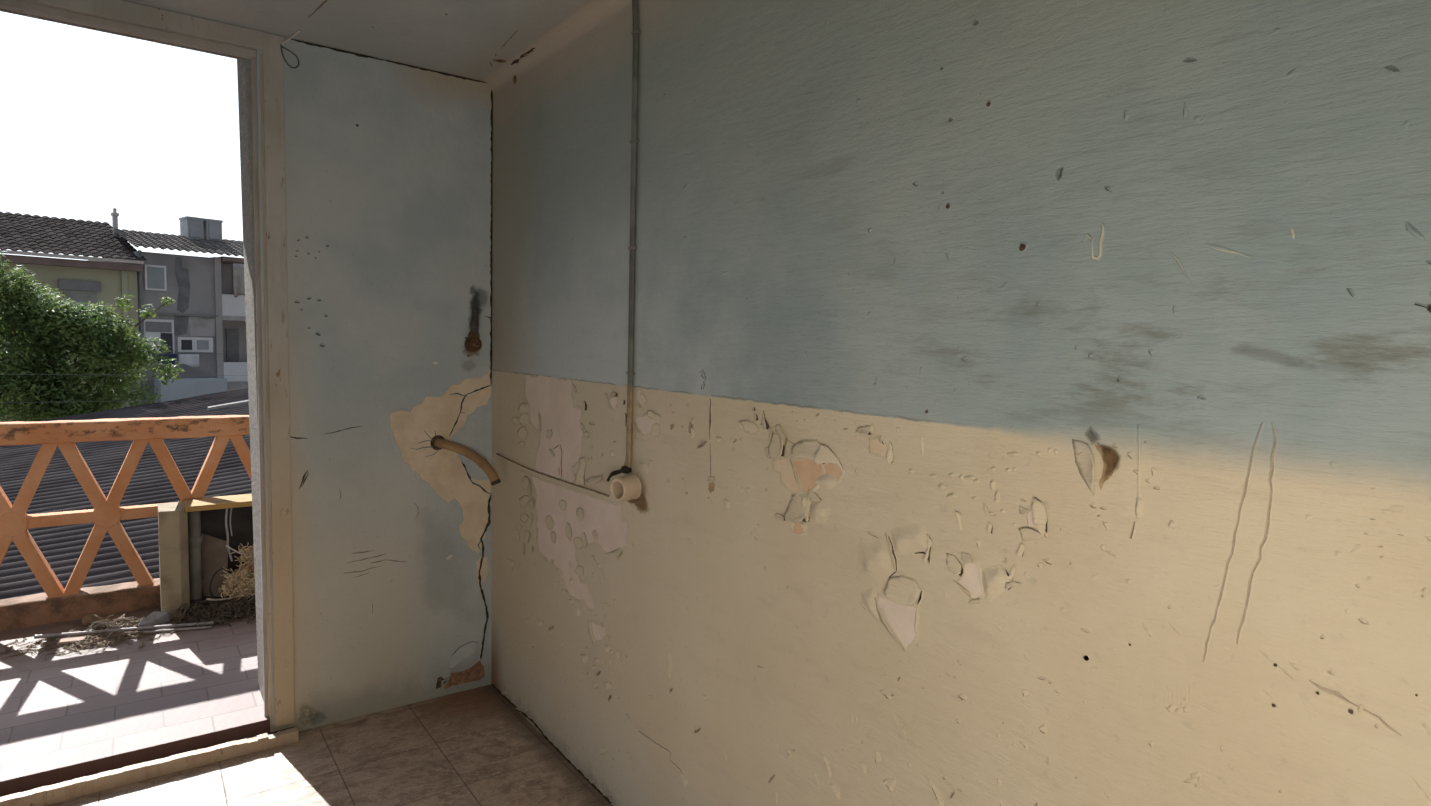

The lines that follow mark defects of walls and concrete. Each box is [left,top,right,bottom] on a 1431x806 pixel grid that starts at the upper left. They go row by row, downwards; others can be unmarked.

peeling [386,366,492,589]
peeling [511,372,894,613]
peeling [946,503,994,604]
peeling [1003,497,1071,590]
peeling [1072,439,1160,557]
peeling [875,576,923,654]
spalling [434,658,487,692]